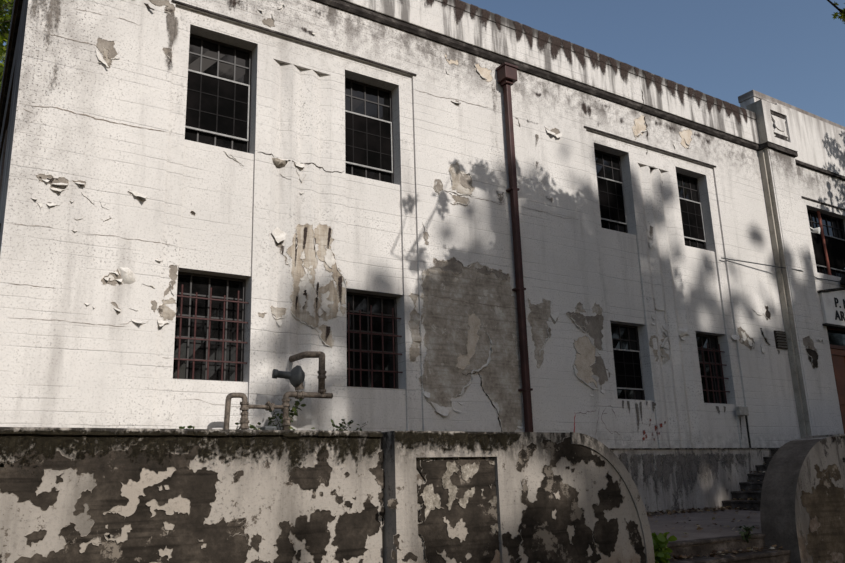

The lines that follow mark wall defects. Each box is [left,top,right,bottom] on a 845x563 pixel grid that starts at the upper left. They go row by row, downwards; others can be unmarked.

leakage [32,0,61,50]
peeling [95,37,120,68]
leakage [166,9,178,68]
leakage [424,0,501,30]
leakage [514,21,747,124]
crack [258,152,344,173]
peeling [36,173,110,221]
peeling [111,259,179,327]
peeling [258,223,347,348]
peeling [408,256,611,432]
peeling [0,444,399,563]
peeling [391,437,646,563]